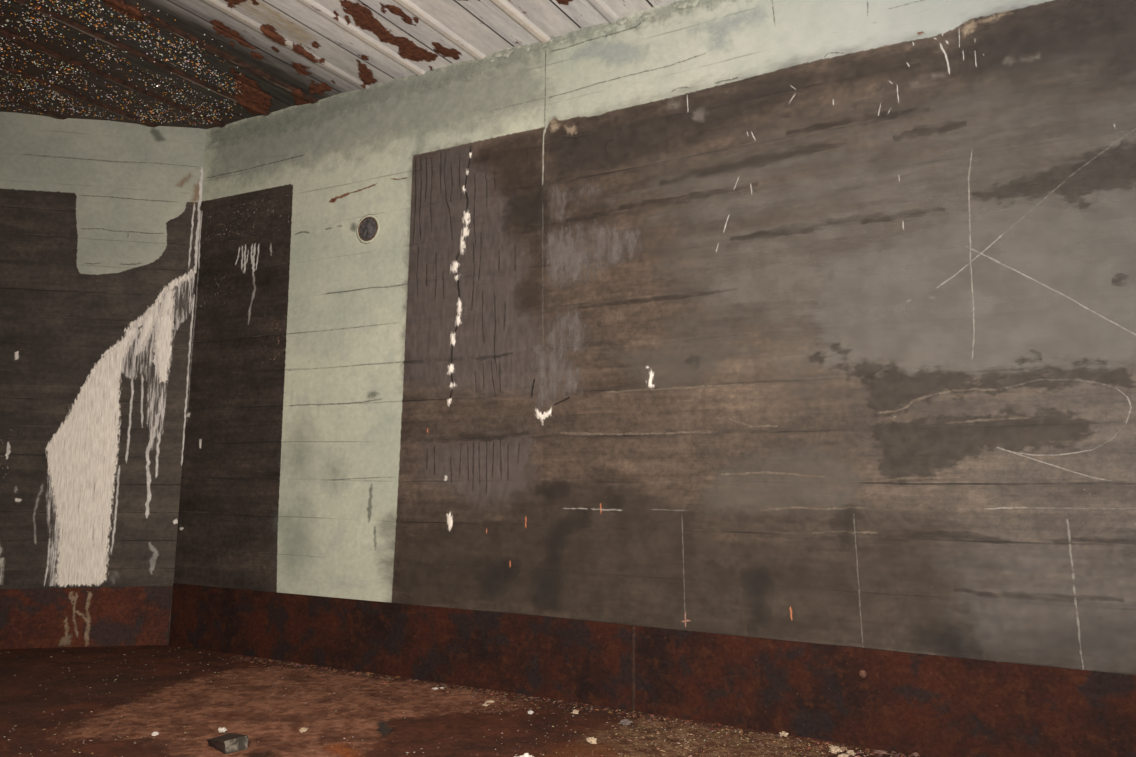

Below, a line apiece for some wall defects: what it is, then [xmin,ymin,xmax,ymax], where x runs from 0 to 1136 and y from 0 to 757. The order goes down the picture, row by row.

corrosion [225,0,259,8]
corrosion [230,68,273,114]
corrosion [210,19,335,106]
corrosion [356,54,377,89]
leakage [211,45,539,174]
corrosion [333,0,461,71]
leakage [977,0,1136,73]
leakage [543,77,811,284]
leakage [235,243,272,319]
leakage [667,96,1136,480]
leakage [33,167,204,647]
corrosion [63,655,920,757]